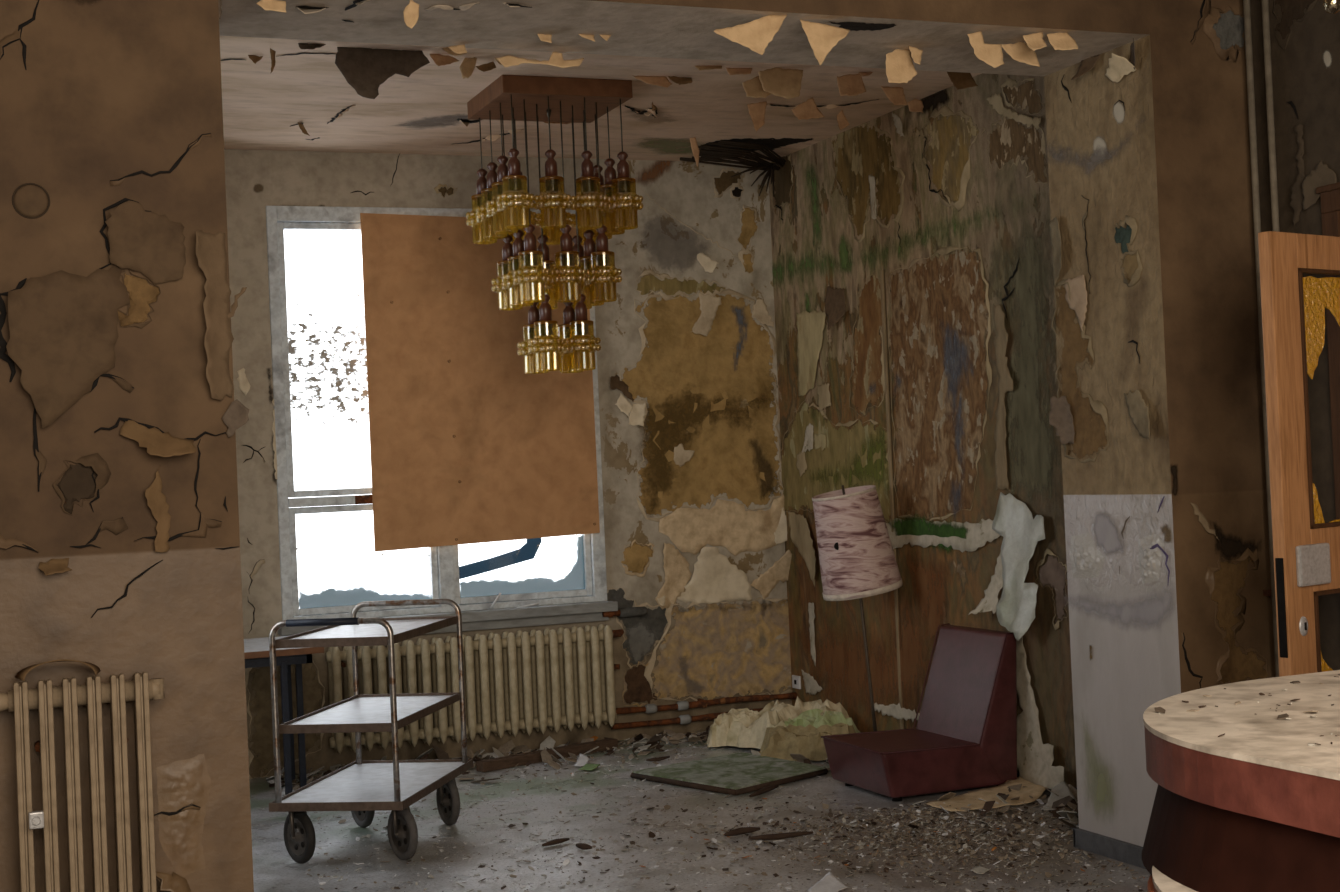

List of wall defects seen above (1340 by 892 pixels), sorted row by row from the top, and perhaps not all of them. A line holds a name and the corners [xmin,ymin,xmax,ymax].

peeling [298,34,584,99]
peeling [632,15,896,120]
peeling [837,46,923,96]
flaking render [947,31,1136,183]
crack [97,133,212,270]
spalling [680,137,813,275]
crack [0,278,27,382]
flaking render [1049,217,1109,463]
crack [0,374,265,634]
damp [639,392,767,512]
damp [753,443,773,494]
flaking render [607,246,1068,790]